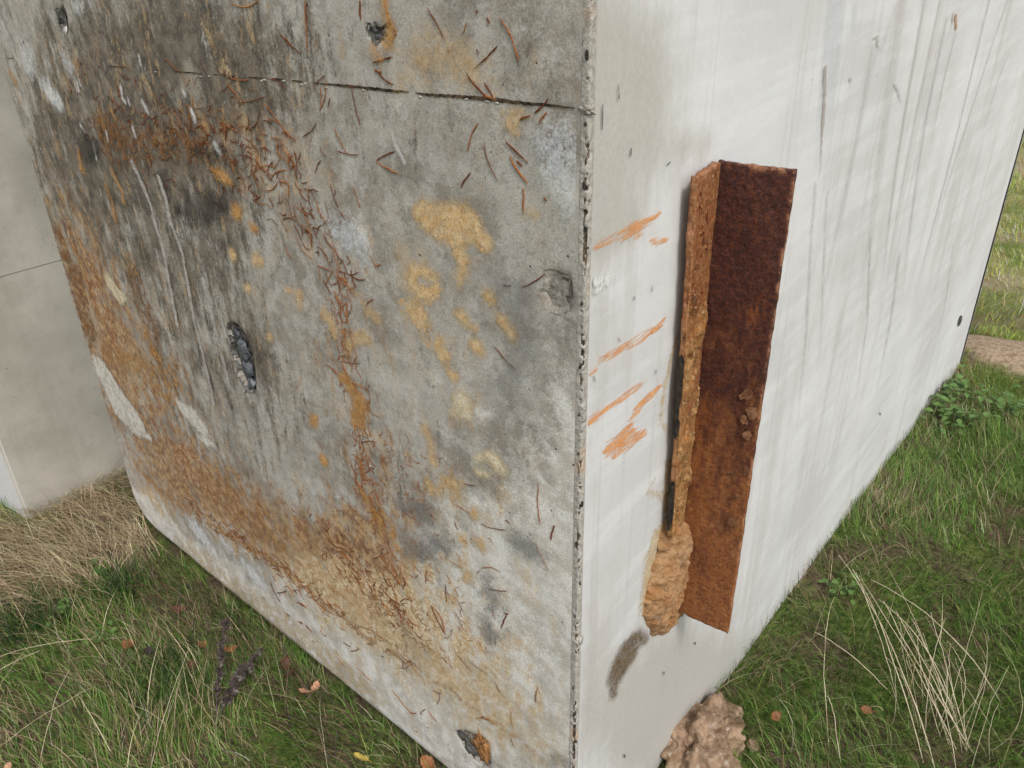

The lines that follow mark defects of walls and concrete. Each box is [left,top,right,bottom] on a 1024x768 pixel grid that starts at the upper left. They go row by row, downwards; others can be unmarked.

crack [155,69,575,109]
rust [503,98,549,214]
rust [593,212,669,249]
spalling [226,322,257,394]
rust [52,20,543,755]
rust [588,383,662,459]
rust [590,318,666,375]
rust [671,167,719,539]
leakage [609,631,647,698]
spalling [454,729,491,767]